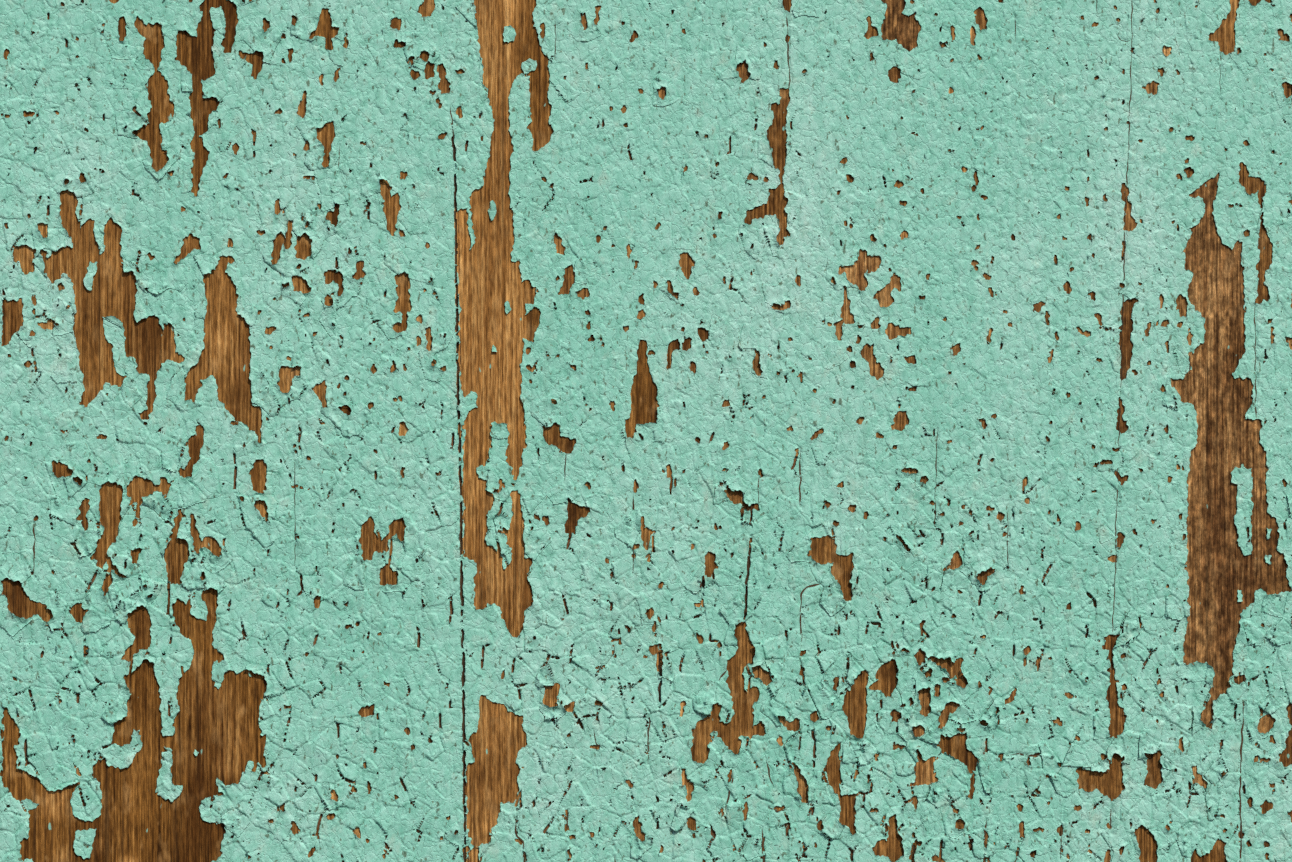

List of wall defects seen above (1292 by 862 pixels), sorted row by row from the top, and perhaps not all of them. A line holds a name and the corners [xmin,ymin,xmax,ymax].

peeling [0,158,374,862]
peeling [101,0,679,743]
crack [450,106,468,862]
peeling [404,695,527,862]
crack [647,652,663,758]
crack [743,548,753,619]
crack [762,761,786,862]
peeling [609,222,966,493]
crack [796,453,804,508]
crack [800,584,819,642]
peeling [616,543,1029,862]
peeling [1011,158,1292,862]